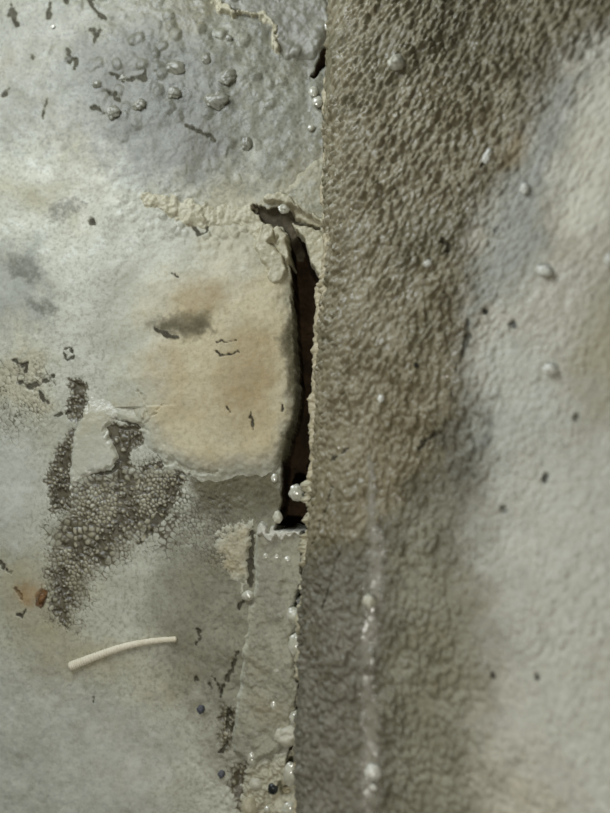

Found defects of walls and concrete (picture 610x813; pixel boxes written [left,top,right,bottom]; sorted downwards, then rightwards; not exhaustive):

damp [0,0,324,230]
damp [140,192,265,246]
damp [154,311,209,339]
crack [12,347,75,417]
damp [167,0,610,813]
crack [91,462,120,475]
spalling [41,377,242,635]
rust [35,588,48,608]